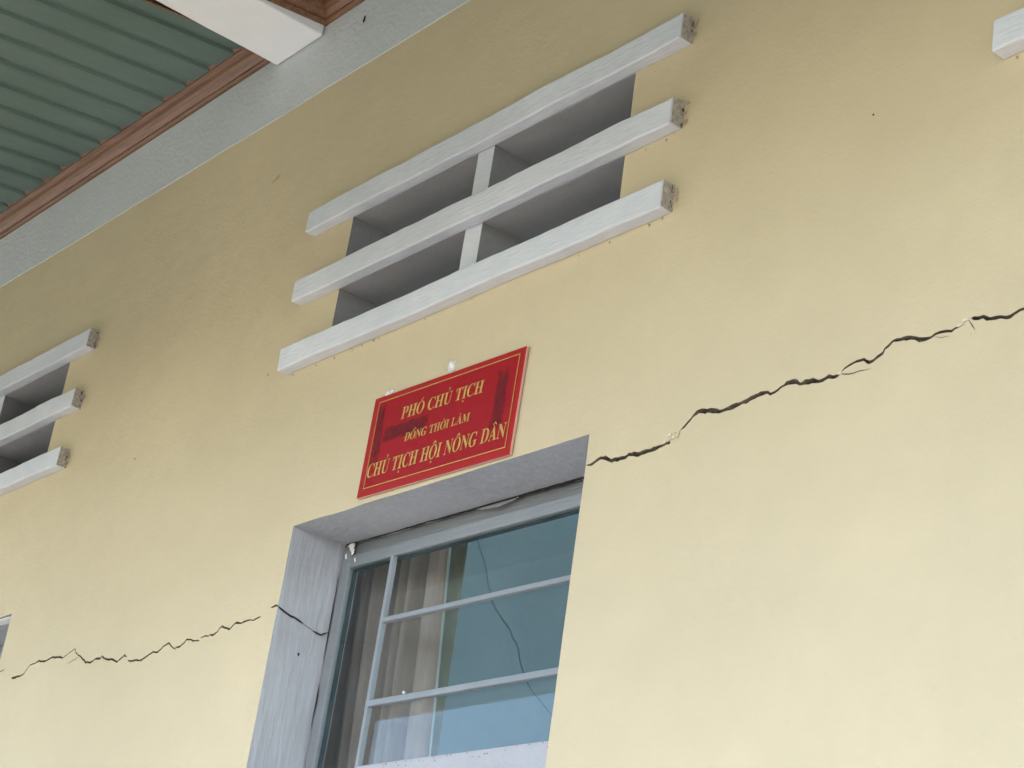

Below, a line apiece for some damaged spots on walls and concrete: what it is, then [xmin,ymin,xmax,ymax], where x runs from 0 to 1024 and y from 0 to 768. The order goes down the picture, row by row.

crack [347,307,1024,545]
crack [0,575,339,679]